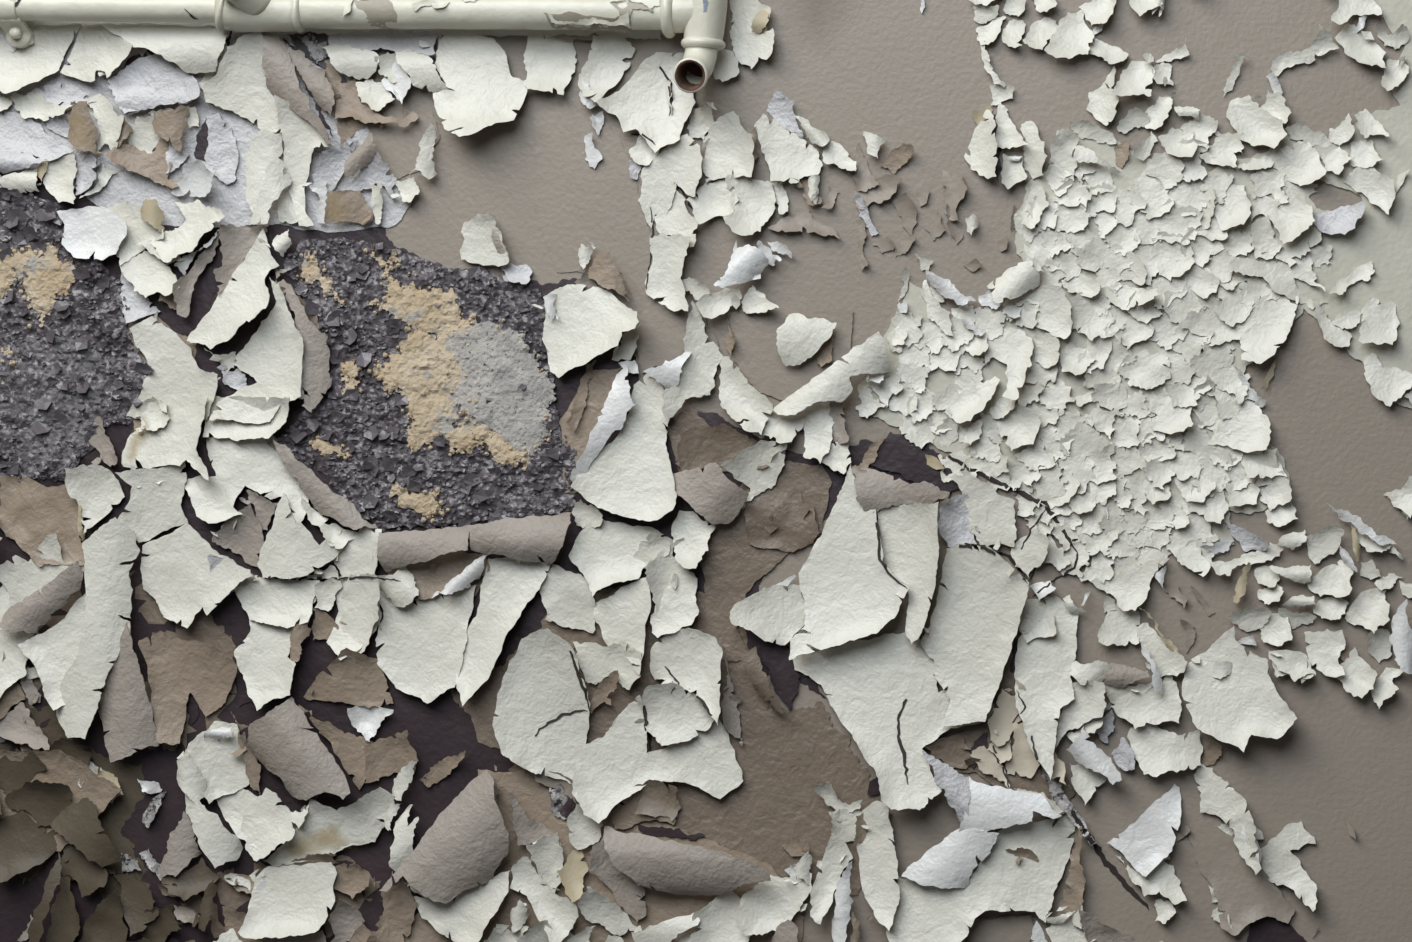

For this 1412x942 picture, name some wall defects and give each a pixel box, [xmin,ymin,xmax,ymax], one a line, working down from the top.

spalling [0,21,890,942]
peeling [546,12,632,29]
peeling [611,0,660,9]
peeling [671,0,1412,942]